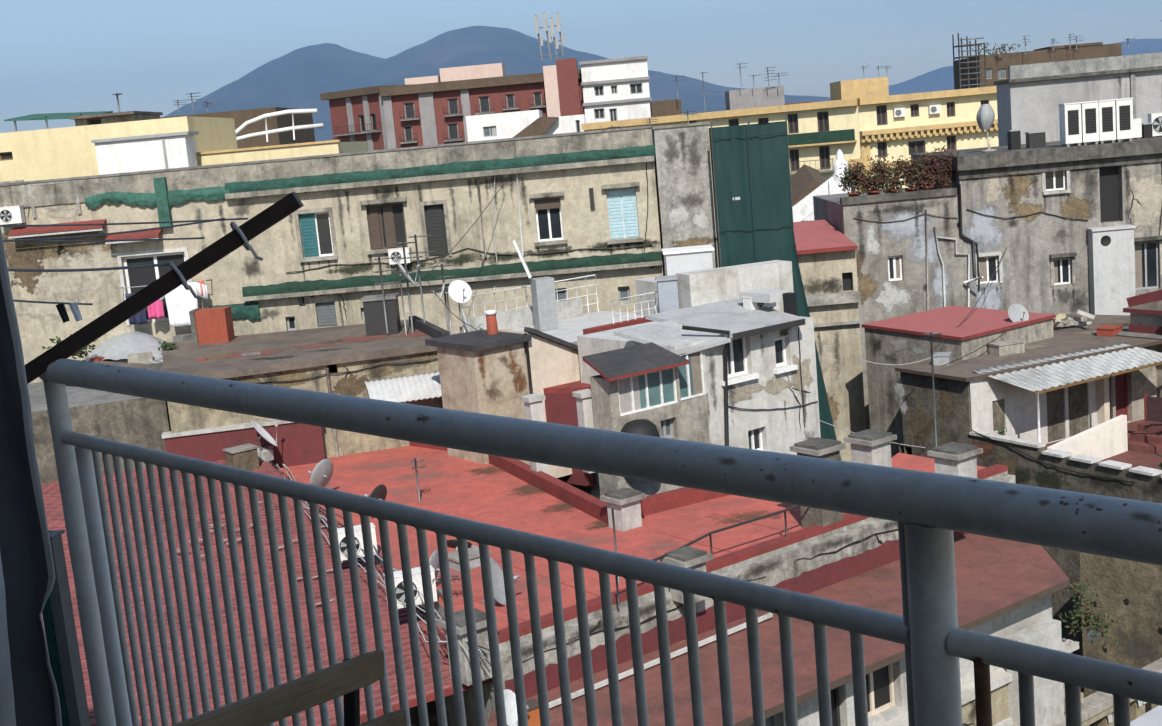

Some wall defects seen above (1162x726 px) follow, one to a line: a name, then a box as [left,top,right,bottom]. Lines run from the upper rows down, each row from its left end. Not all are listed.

leakage [666,134,700,175]
leakage [672,196,702,207]
spalling [1059,194,1096,221]
peeling [963,174,1045,310]
corrosion [501,351,526,391]